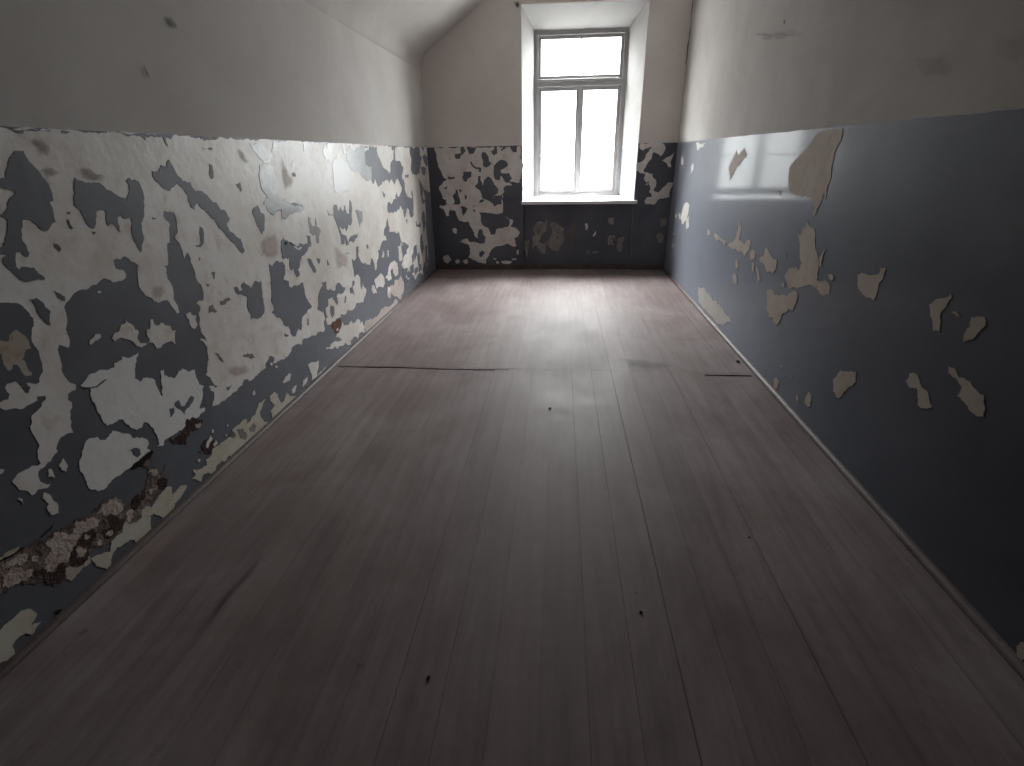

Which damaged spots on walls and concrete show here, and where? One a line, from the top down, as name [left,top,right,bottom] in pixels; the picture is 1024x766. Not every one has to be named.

peeling [622,143,694,204]
peeling [656,202,690,247]
peeling [707,128,843,325]
peeling [857,268,887,300]
peeling [929,294,986,342]
peeling [0,126,564,594]
peeling [833,371,856,398]
peeling [906,373,933,409]
peeling [948,366,985,417]
peeling [0,609,41,663]